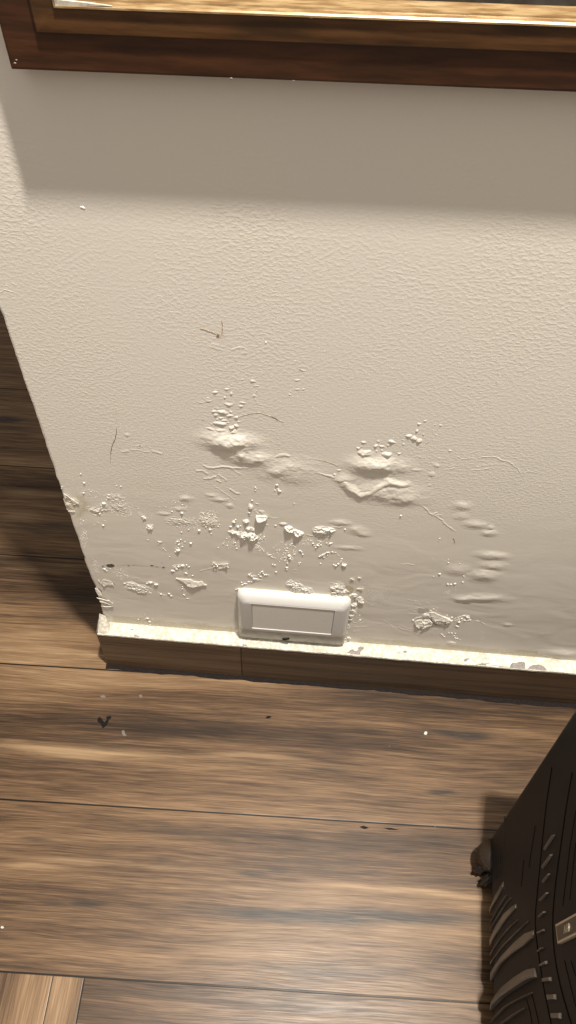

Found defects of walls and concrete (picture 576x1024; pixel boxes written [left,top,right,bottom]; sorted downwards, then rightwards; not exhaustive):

peeling [254,503,279,526]
flaking render [95,563,114,634]
peeling [176,561,229,599]
peeling [405,599,486,629]